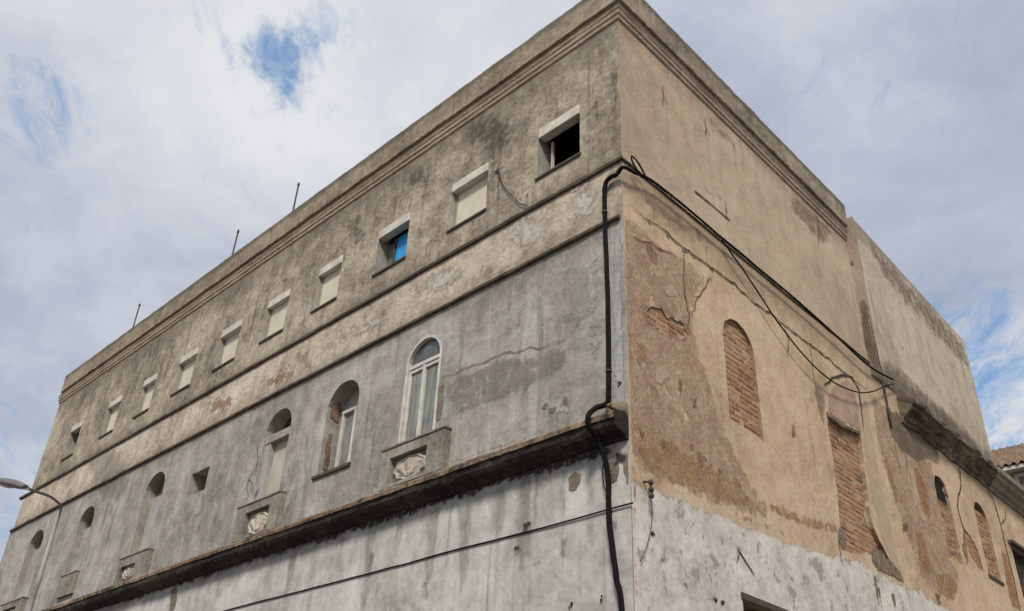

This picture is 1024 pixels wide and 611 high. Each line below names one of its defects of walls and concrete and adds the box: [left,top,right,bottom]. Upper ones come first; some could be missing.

crack [630,204,885,431]
flaking render [323,434,332,470]
flaking render [330,403,342,422]
flaking render [436,324,578,421]
peeling [568,471,581,491]
peeling [609,217,958,611]
crack [957,466,1021,610]